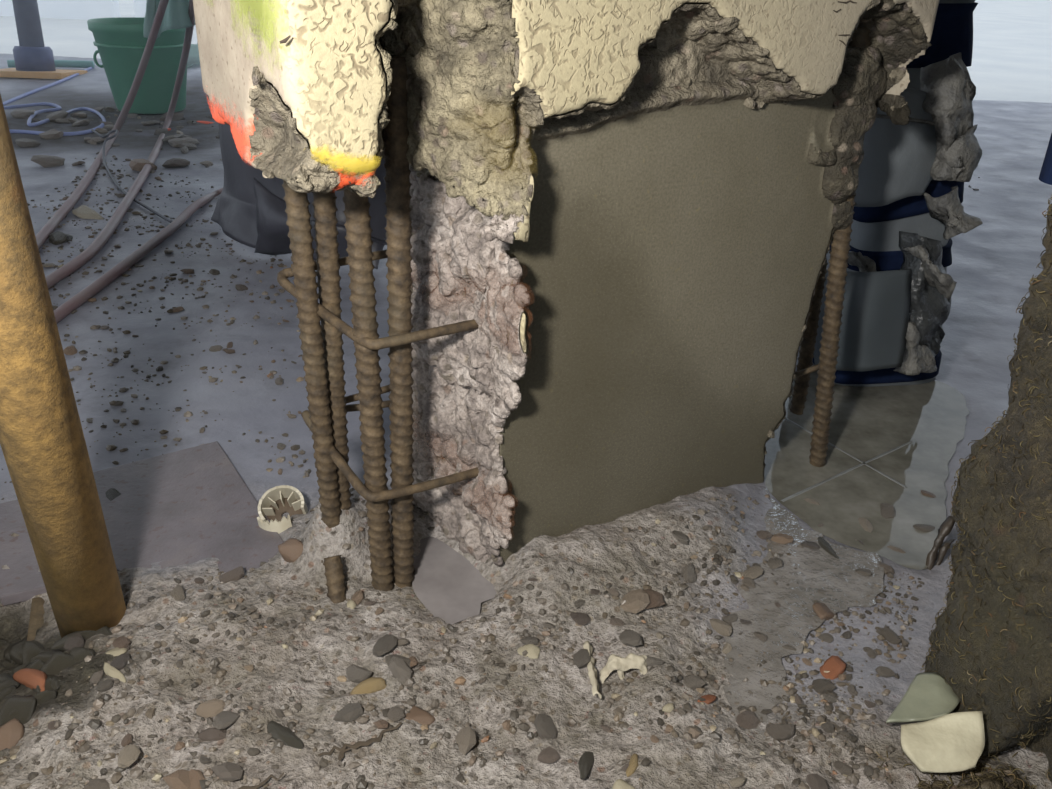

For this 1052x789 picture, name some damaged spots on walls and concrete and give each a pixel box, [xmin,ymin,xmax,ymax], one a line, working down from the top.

spalling [249,0,932,567]